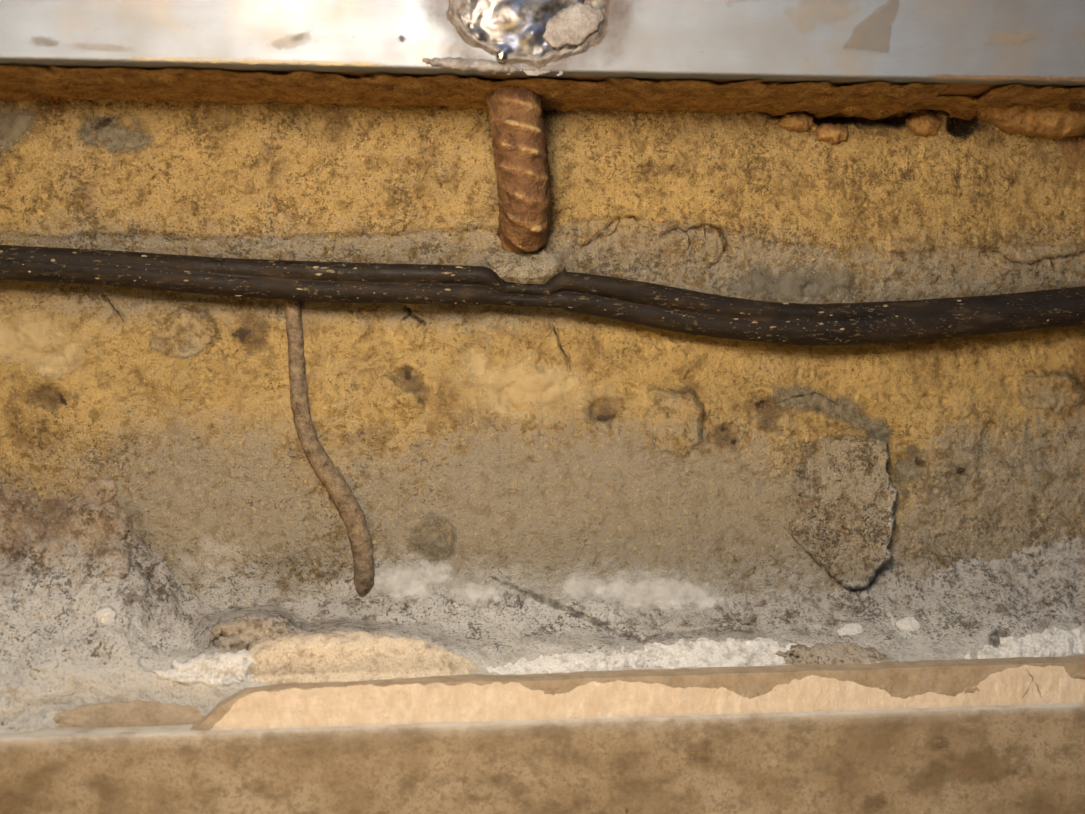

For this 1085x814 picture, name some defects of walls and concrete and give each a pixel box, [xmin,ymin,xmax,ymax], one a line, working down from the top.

spalling [78,114,153,152]
spalling [486,79,552,253]
crack [582,216,639,247]
crack [662,225,740,268]
crack [981,250,1085,267]
spalling [235,316,267,348]
spalling [28,386,67,408]
spalling [392,368,425,392]
spalling [755,386,929,590]
leakage [371,561,501,603]
leakage [561,572,728,611]
flaking render [209,665,1085,731]